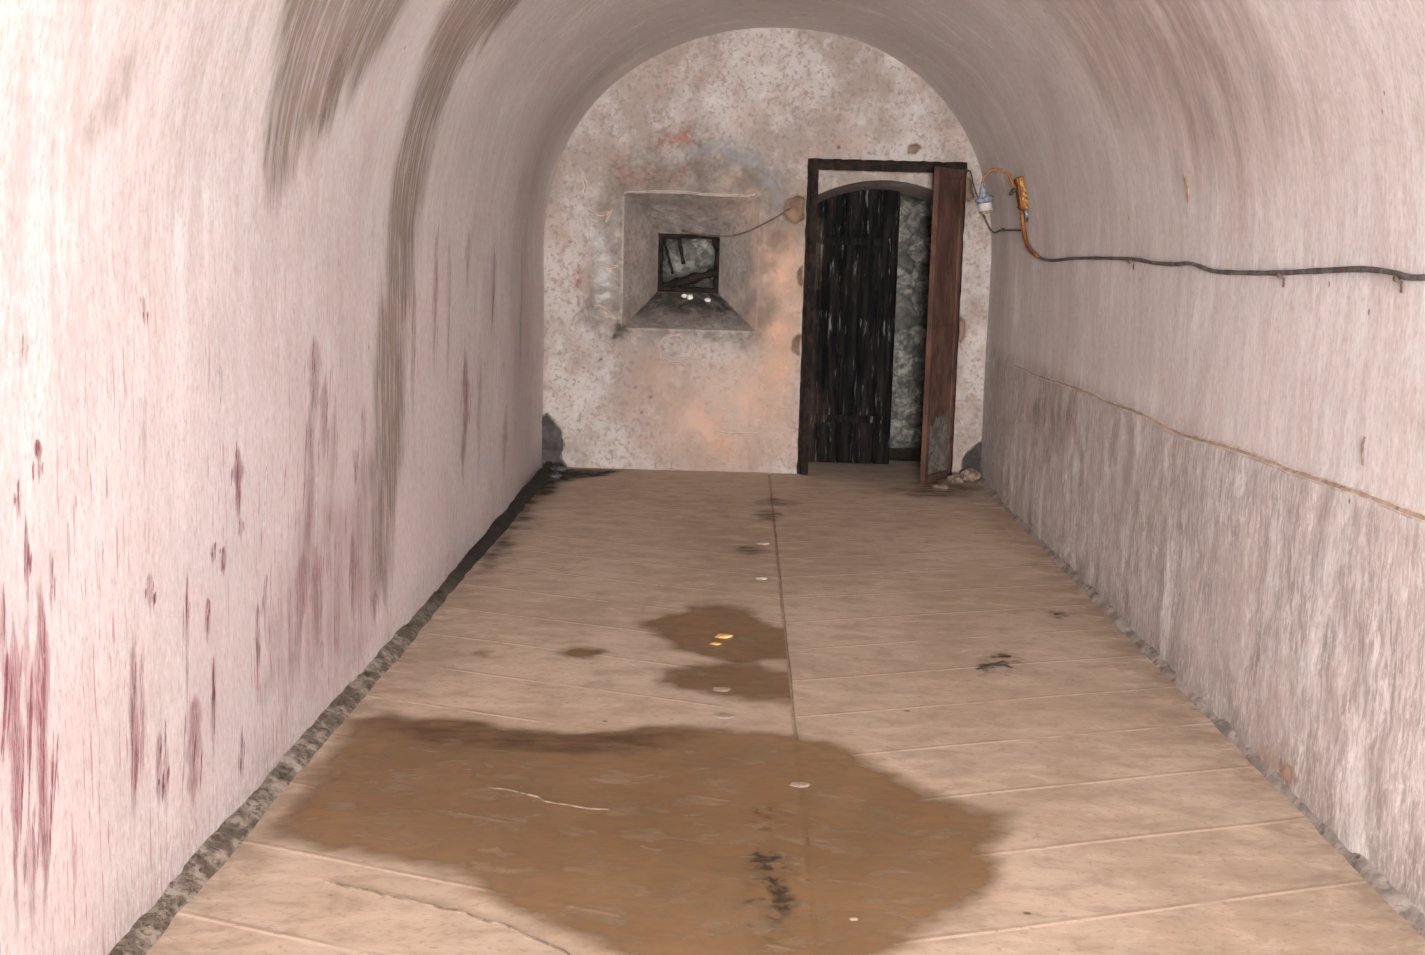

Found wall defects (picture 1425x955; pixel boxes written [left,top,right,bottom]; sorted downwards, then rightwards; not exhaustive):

water stain [265,0,404,182]
water stain [376,0,520,583]
water stain [593,237,626,338]
corrosion [14,440,43,573]
corrosion [231,443,244,528]
water stain [488,469,617,555]
crack [1006,362,1425,523]
water stain [643,606,791,700]
corrosion [1,608,58,866]
corrosion [158,715,202,798]
water stain [282,717,1001,955]